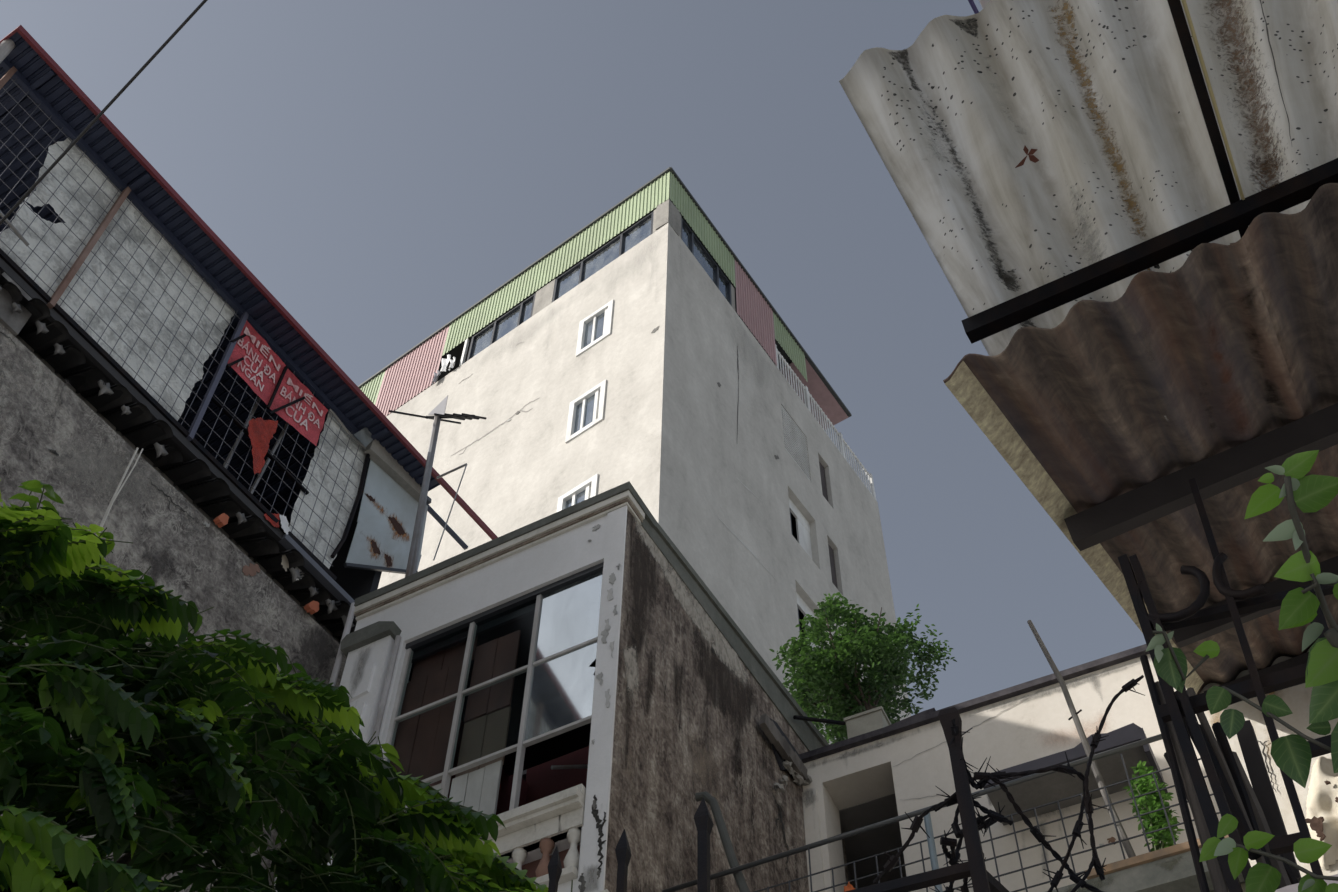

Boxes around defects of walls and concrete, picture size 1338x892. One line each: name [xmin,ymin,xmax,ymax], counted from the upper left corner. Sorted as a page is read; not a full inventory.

water stain [1247,156,1282,192]
water stain [996,270,1020,291]
corrosion [367,537,392,573]
corrosion [365,493,409,540]
peeling [601,564,639,691]
water stain [625,528,658,711]
peeling [635,519,747,682]
water stain [675,627,753,774]
crack [591,795,606,876]